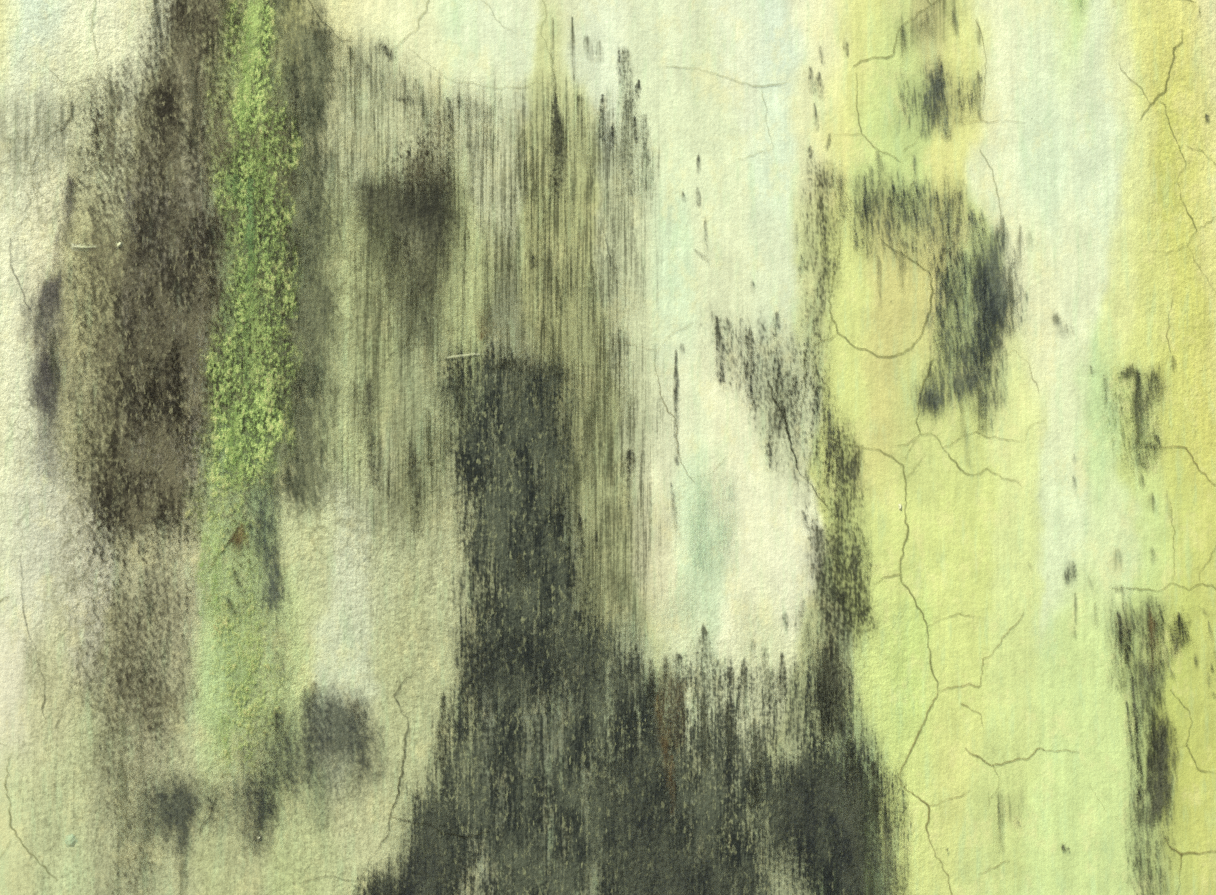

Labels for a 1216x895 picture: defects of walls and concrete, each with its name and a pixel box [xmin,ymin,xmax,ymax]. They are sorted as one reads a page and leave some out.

water stain [903,60,982,135]
crack [1135,43,1216,164]
water stain [27,0,381,895]
water stain [354,148,1026,895]
crack [831,243,1017,830]
water stain [1090,356,1176,465]
water stain [1110,598,1188,895]